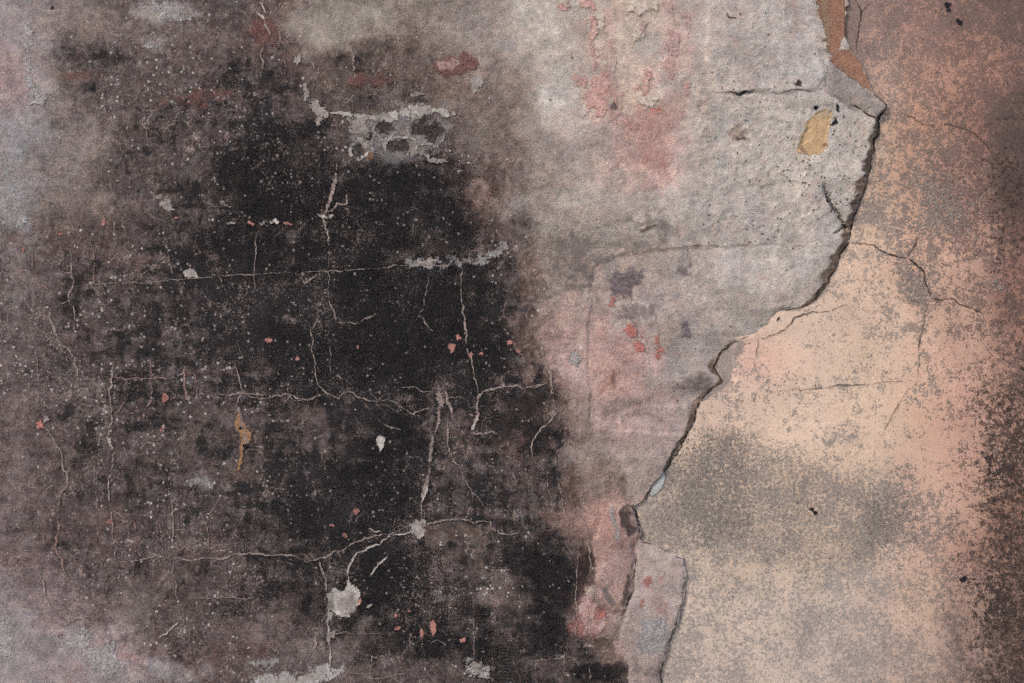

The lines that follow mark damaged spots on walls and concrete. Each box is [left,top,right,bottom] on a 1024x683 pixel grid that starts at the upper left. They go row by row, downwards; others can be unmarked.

spalling [302,83,461,164]
leakage [432,51,479,77]
crack [715,81,826,96]
spalling [796,0,886,156]
efflorescence [405,240,507,269]
corrosion [235,407,251,471]
crack [32,164,592,679]
crack [621,93,1024,681]
mould [960,360,1024,683]
spalling [326,569,372,644]
flaking render [614,541,686,683]
efflorescence [250,659,344,683]